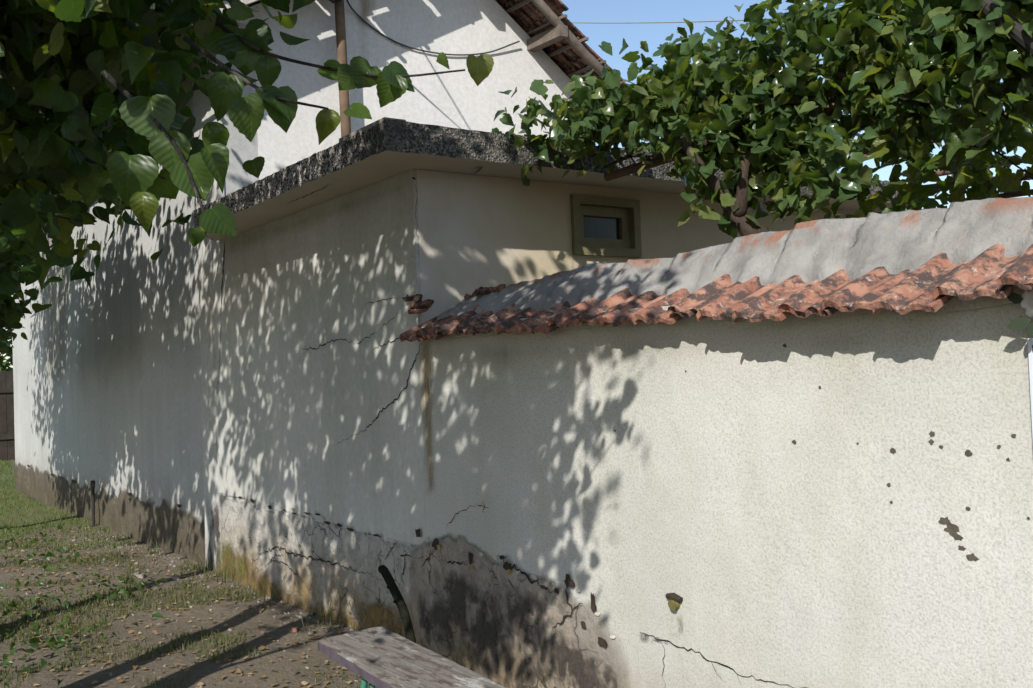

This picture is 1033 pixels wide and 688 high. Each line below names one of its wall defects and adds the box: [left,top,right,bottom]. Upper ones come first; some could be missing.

crack [305,294,420,443]
flaking render [11,460,206,565]
flaking render [218,492,617,688]
crack [640,632,805,688]